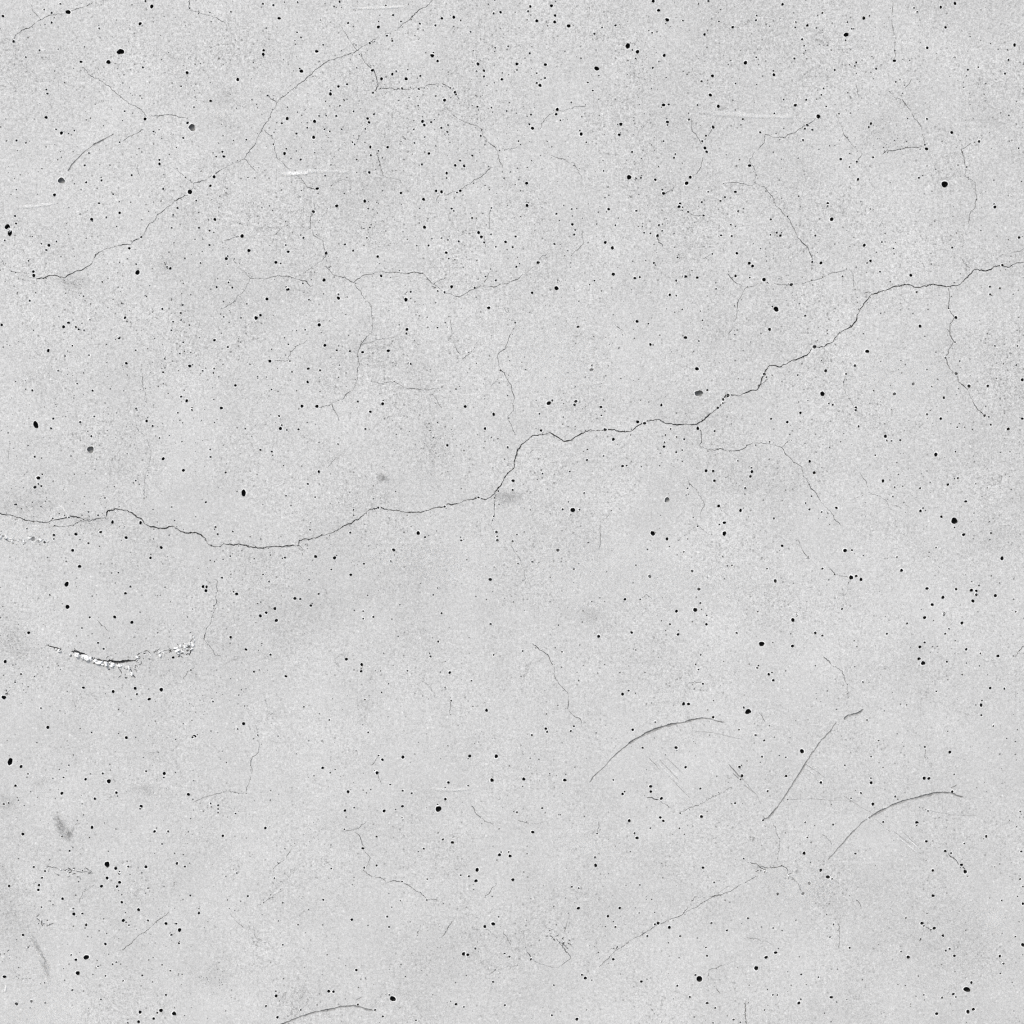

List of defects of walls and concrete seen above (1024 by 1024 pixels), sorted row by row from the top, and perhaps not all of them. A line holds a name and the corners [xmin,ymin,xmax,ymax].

crack [0,3,1024,582]
spalling [48,632,195,679]